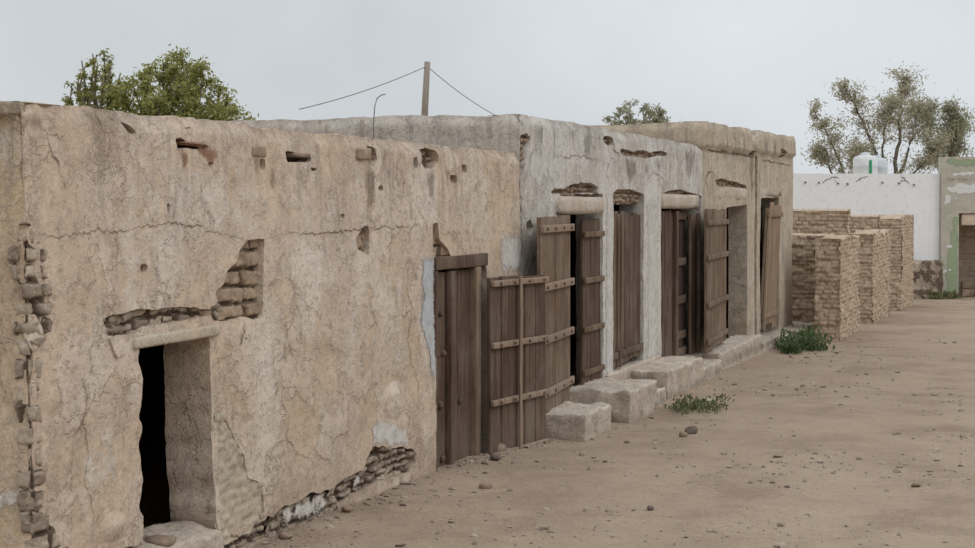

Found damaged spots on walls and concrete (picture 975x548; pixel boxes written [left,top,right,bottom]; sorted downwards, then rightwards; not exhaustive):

crack [38,163,425,258]
flaking render [199,239,262,321]
spalling [0,222,69,548]